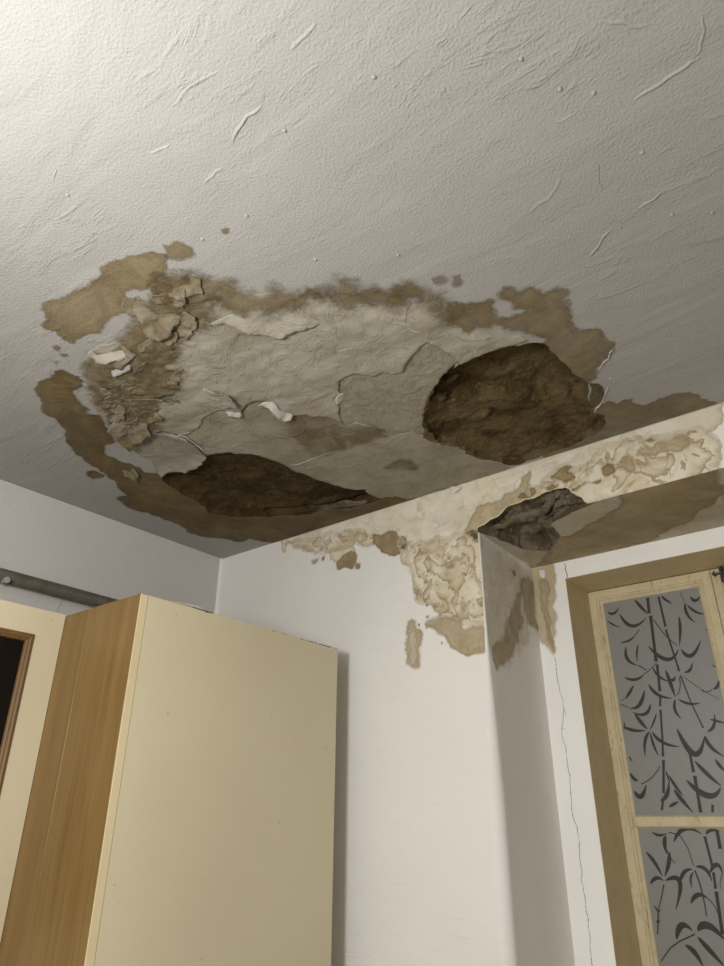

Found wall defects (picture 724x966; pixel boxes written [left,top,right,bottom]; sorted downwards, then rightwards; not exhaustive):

peeling [83,275,606,518]
spalling [478,486,593,551]